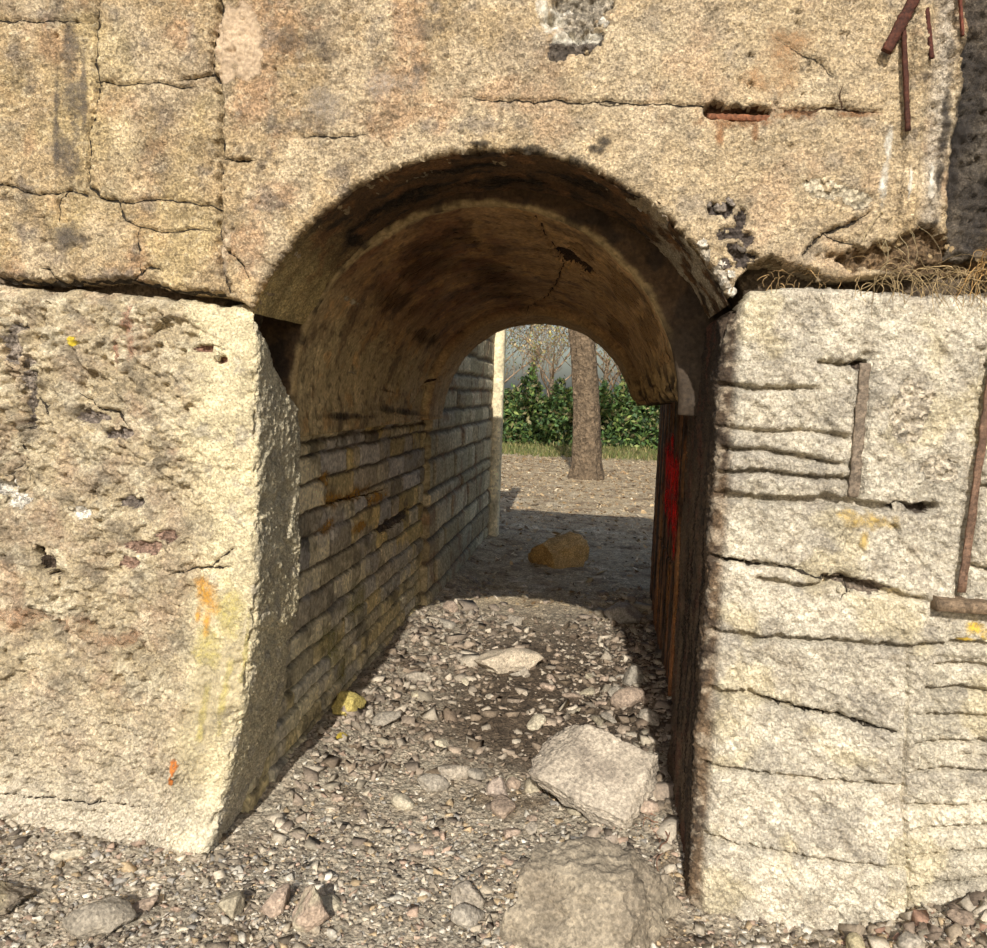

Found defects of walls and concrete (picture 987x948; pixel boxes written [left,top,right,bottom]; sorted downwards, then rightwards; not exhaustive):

spalling [545,0,614,62]
rust [881,0,935,132]
crack [0,0,254,298]
damp [929,45,987,255]
crack [526,215,581,314]
spalling [695,197,823,298]
crack [802,213,868,256]
spalling [31,544,63,586]
crack [165,548,235,576]
rust [196,578,214,628]